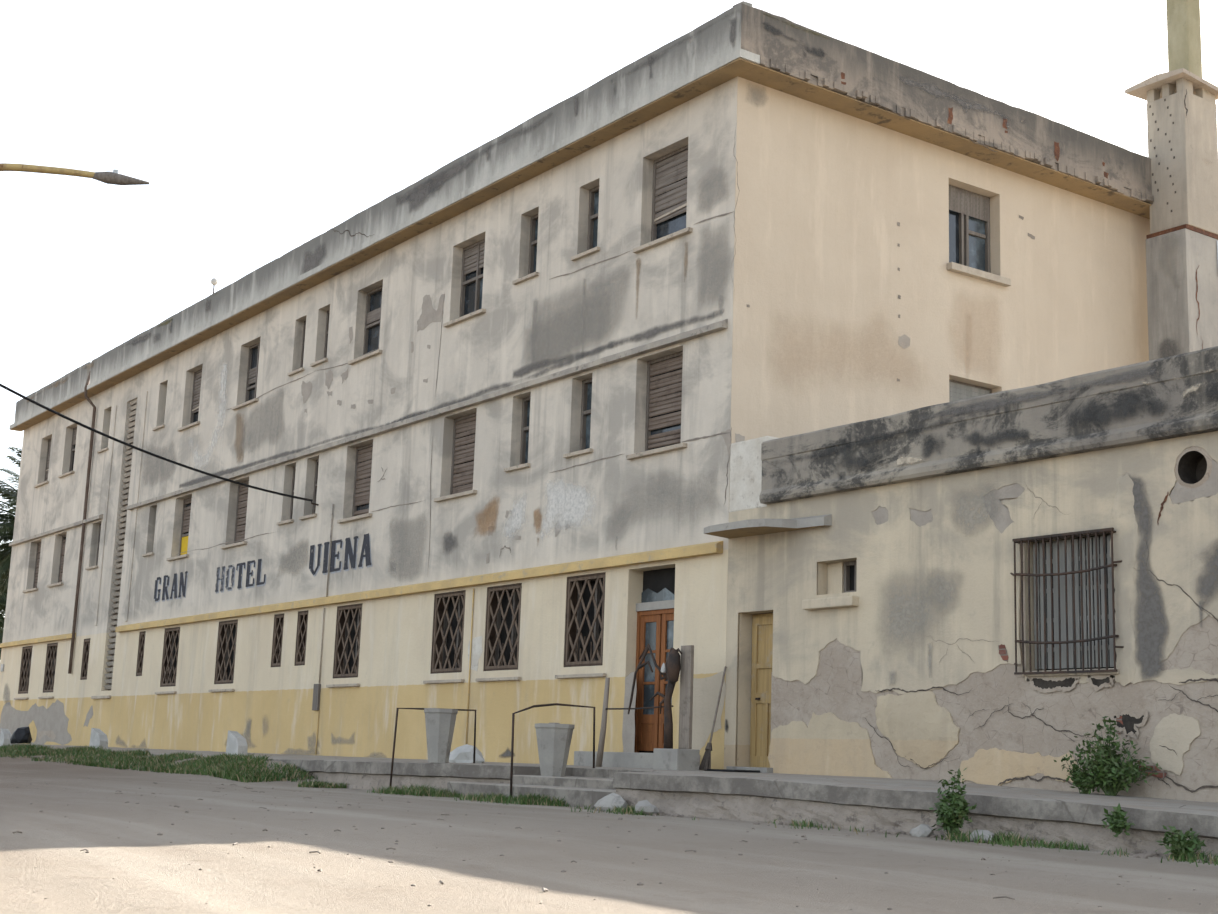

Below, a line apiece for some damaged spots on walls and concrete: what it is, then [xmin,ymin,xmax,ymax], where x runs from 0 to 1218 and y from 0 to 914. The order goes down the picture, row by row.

damp [397,123,540,209]
damp [303,247,324,273]
damp [1071,341,1176,425]
damp [797,387,1077,480]
peeling [983,483,1025,533]
damp [1131,478,1168,678]
crack [1148,492,1218,622]
damp [1198,546,1218,619]
peeling [0,699,72,745]
flaking render [771,615,1218,803]